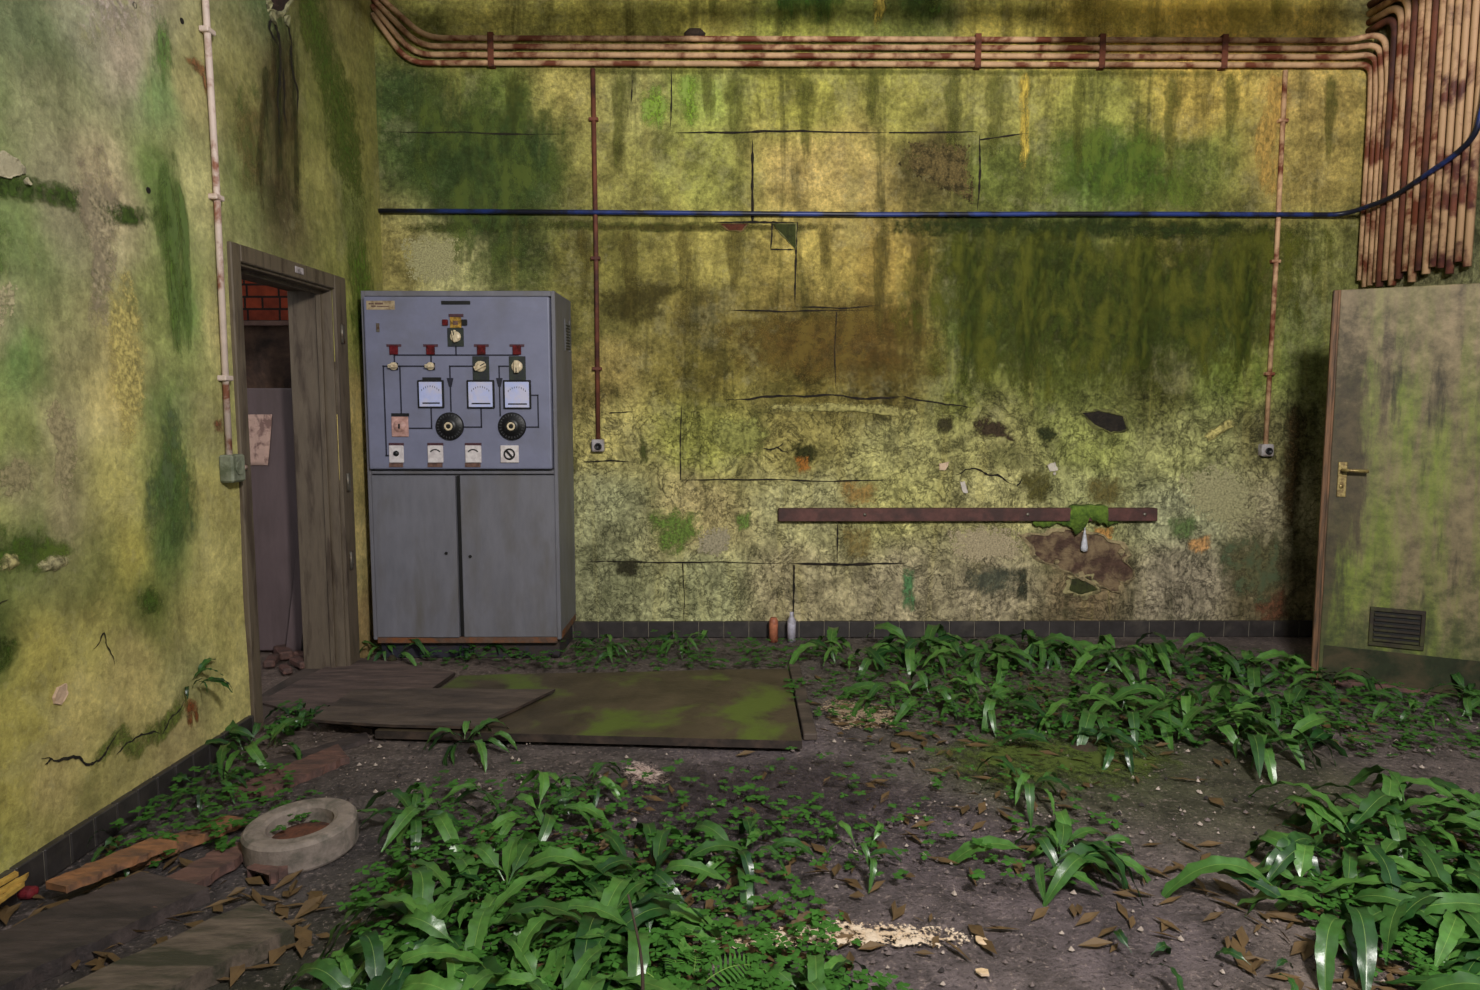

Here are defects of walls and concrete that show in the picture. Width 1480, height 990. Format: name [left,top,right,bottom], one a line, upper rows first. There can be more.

spalling [266,0,294,26]
peeling [0,150,32,185]
water stain [0,146,192,432]
water stain [973,416,1014,441]
spalling [1080,409,1129,435]
water stain [792,444,818,463]
water stain [1220,407,1308,603]
water stain [1080,527,1088,552]
water stain [612,559,639,576]
spalling [947,524,1135,600]
water stain [967,568,1027,601]
crack [41,702,184,766]